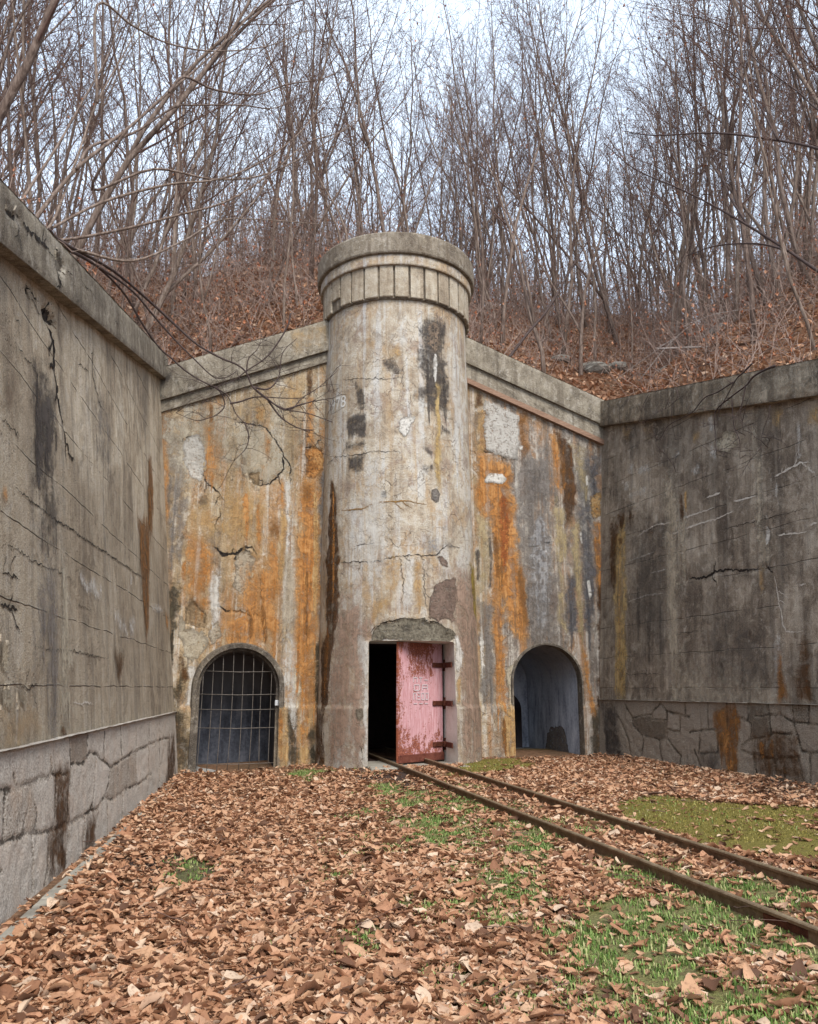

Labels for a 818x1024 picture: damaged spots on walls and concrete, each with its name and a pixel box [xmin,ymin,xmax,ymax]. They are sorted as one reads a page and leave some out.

crack [13,222,105,461]
peeling [183,434,207,481]
damp [346,382,366,471]
damp [417,320,450,481]
peeling [483,400,523,460]
damp [33,361,73,735]
crack [198,465,264,632]
rust [222,486,281,657]
rust [294,477,340,736]
crack [342,535,459,632]
spalling [371,556,458,642]
rust [475,455,526,640]